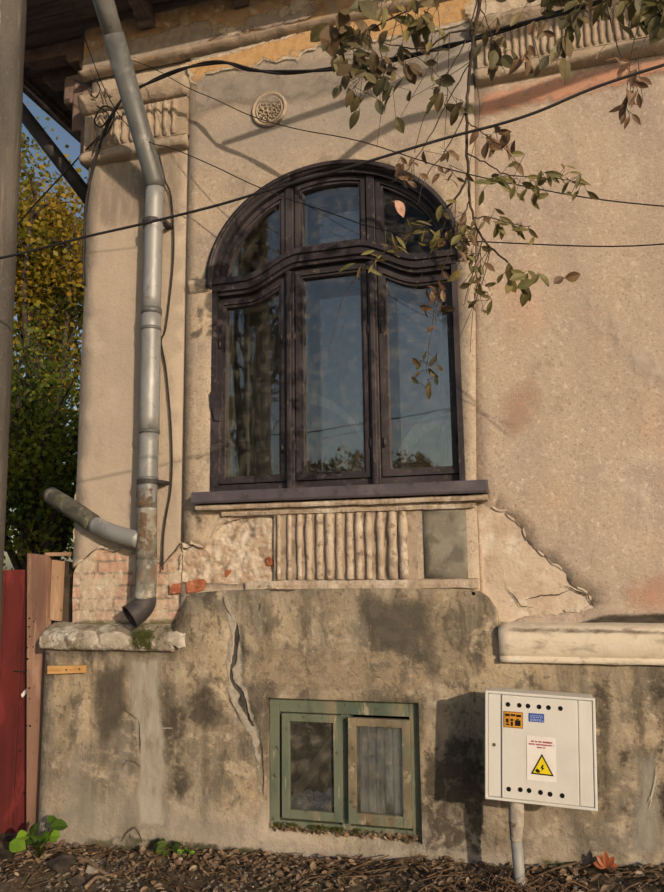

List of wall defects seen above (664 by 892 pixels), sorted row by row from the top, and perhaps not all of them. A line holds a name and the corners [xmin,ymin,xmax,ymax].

peeling [126,0,317,59]
peeling [187,30,321,84]
peeling [350,0,541,42]
flaking render [72,545,136,649]
rust [136,488,153,551]
flaking render [143,515,276,649]
flaking render [481,507,594,622]
crack [507,585,597,609]
water stain [96,659,218,827]
crack [223,596,264,799]
water stain [595,681,612,709]
water stain [422,738,484,854]